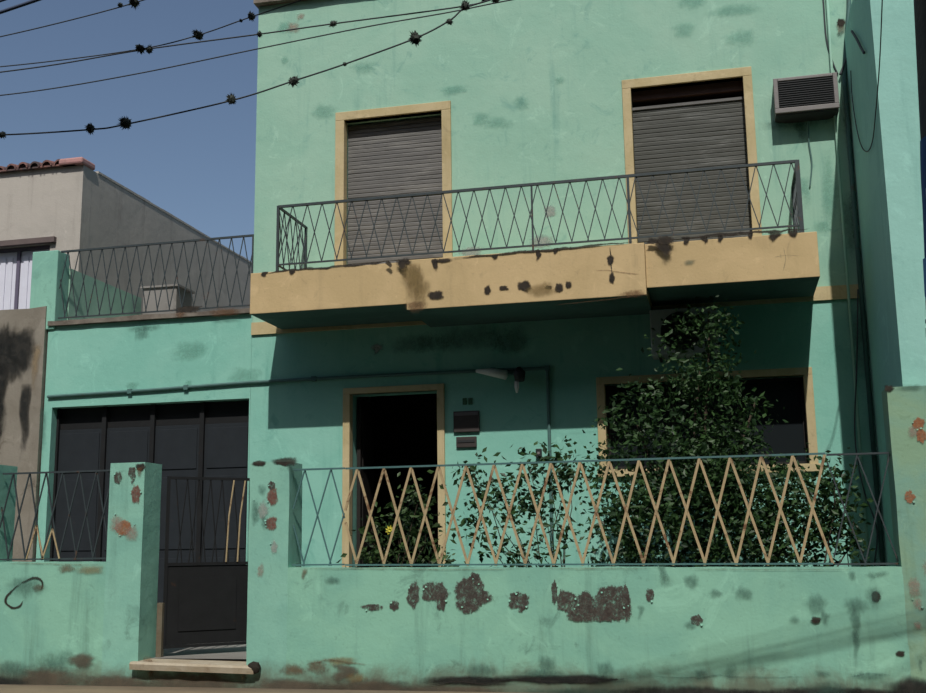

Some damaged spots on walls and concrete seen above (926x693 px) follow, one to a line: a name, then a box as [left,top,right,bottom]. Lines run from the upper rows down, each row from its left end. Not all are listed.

spalling [484,281,571,294]
damp [0,330,40,443]
peeling [360,572,492,614]
peeling [508,591,529,612]
peeling [551,580,632,622]